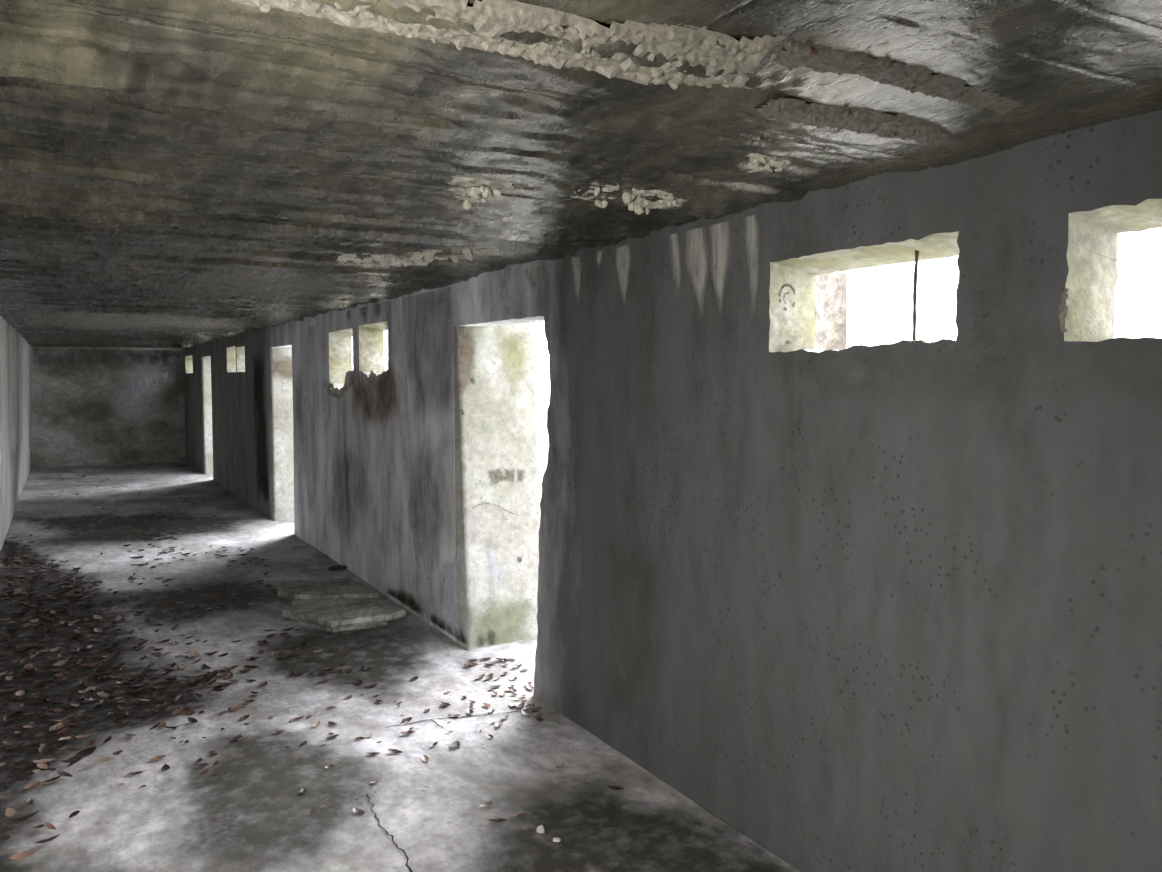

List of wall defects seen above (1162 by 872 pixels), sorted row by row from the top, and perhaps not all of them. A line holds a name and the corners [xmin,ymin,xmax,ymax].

spalling [327,375,354,399]
crack [367,797,413,872]